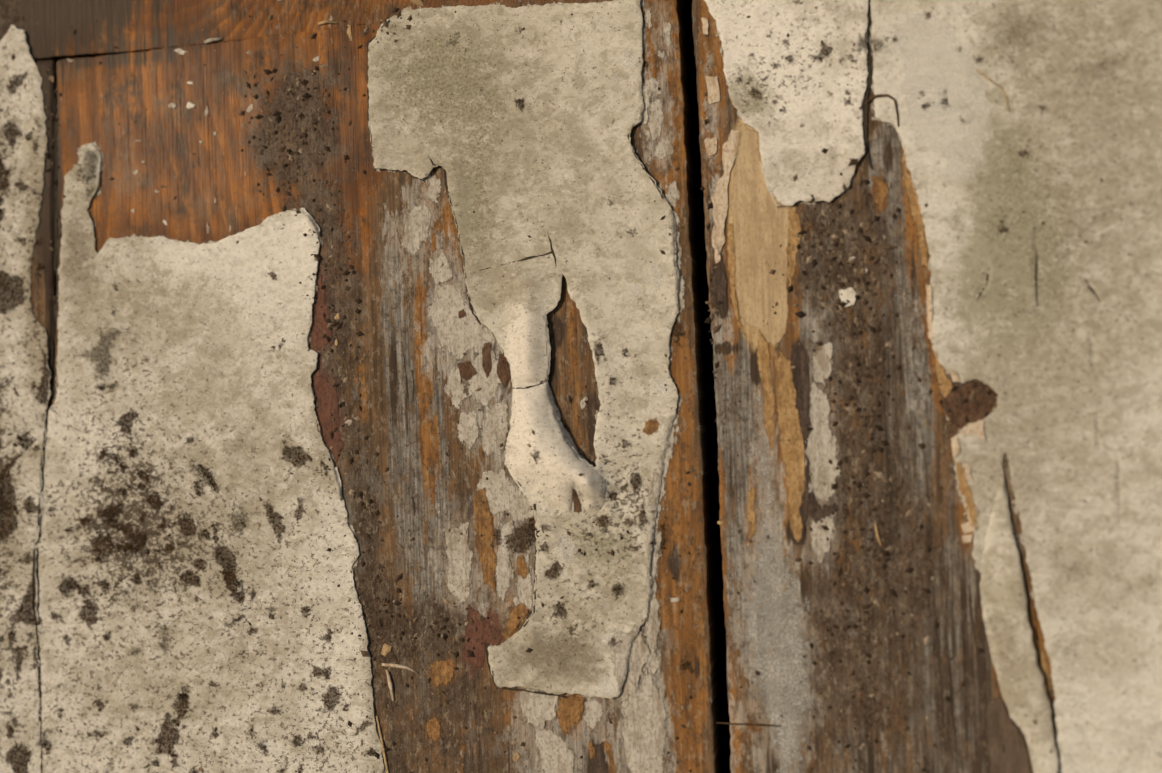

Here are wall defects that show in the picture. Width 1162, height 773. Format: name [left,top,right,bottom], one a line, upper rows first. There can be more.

peeling [0,25,392,773]
peeling [367,0,685,773]
peeling [701,0,1162,773]